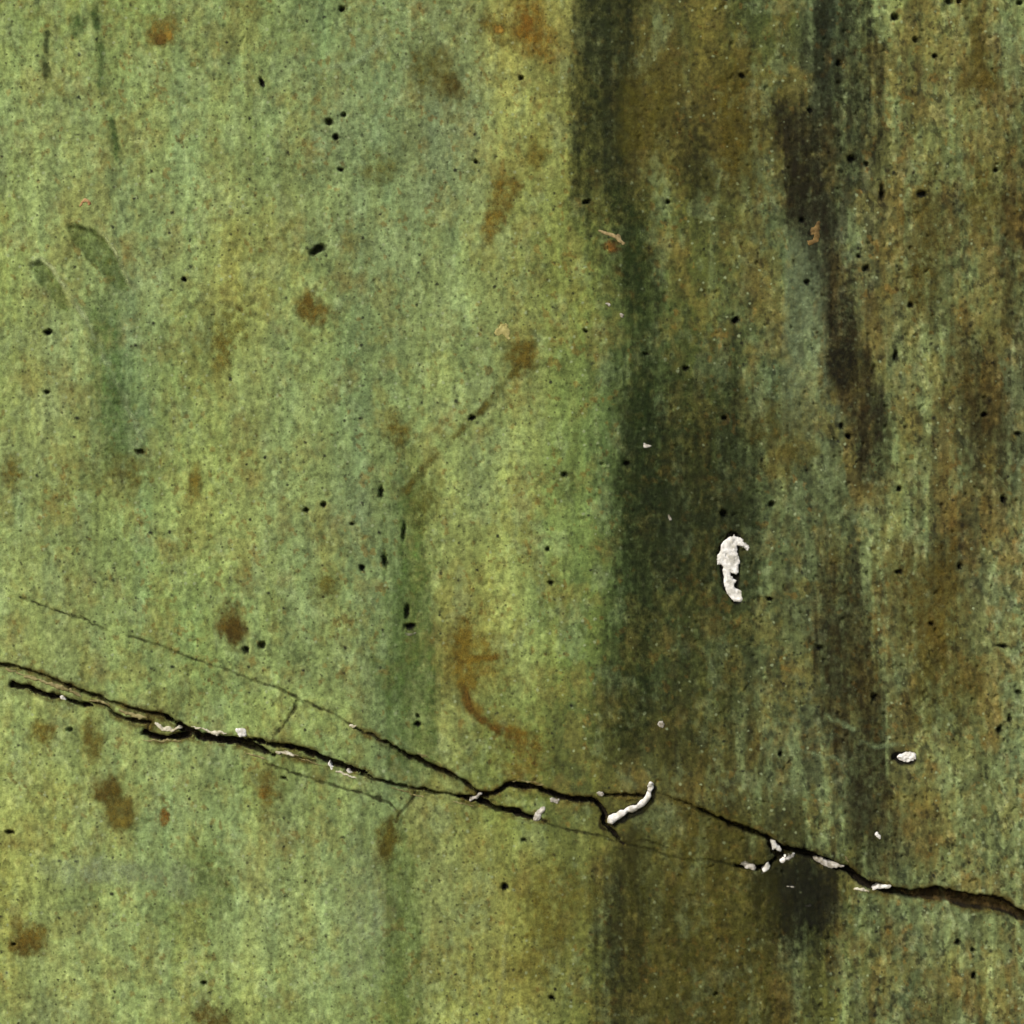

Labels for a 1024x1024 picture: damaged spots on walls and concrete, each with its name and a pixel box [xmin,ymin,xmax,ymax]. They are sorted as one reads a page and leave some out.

water stain [571,0,760,652]
water stain [777,0,890,478]
corrosion [93,776,133,828]
corrosion [215,607,246,644]
corrosion [455,621,539,769]
crack [0,663,1024,920]
water stain [525,810,845,1024]
water stain [814,562,916,859]